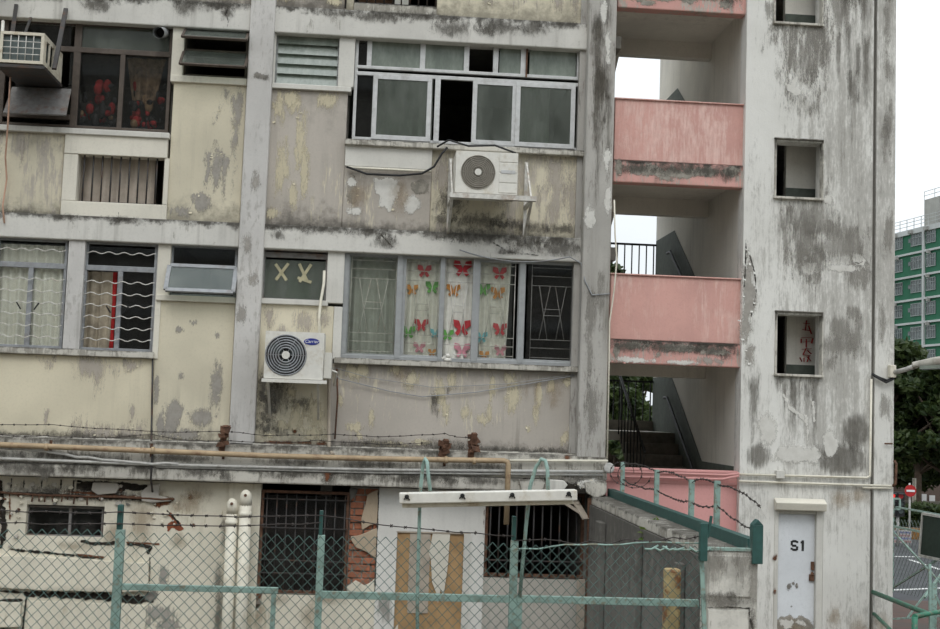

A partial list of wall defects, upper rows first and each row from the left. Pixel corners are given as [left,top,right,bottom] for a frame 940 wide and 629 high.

leakage [324,10,577,38]
leakage [765,0,869,114]
peeling [170,90,243,217]
peeling [346,176,361,216]
peeling [373,158,449,214]
leakage [620,164,735,181]
leakage [881,102,893,156]
leakage [781,202,869,286]
leakage [884,218,893,250]
leakage [610,341,736,359]
spalling [346,487,379,592]